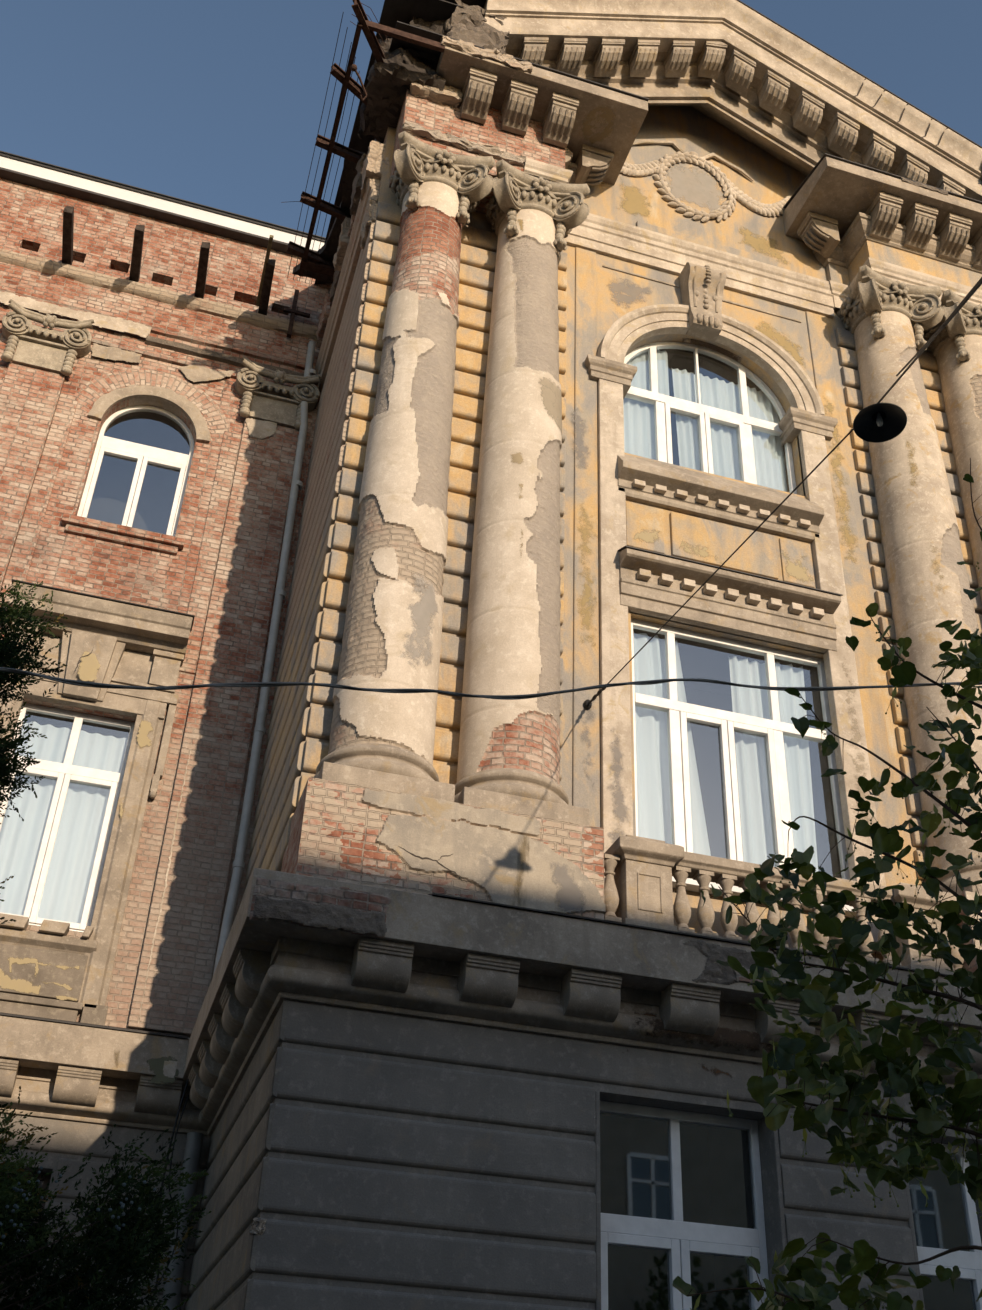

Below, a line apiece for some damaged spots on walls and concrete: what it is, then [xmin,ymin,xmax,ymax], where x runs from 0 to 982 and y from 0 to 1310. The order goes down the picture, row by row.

flaking render [0,291,151,338]
flaking render [91,343,142,363]
flaking render [373,206,463,517]
flaking render [968,374,982,420]
flaking render [328,494,446,762]
flaking render [477,439,562,784]
peeling [579,508,596,638]
flaking render [940,523,981,637]
flaking render [249,777,605,938]
crack [400,847,472,884]
peeling [0,957,80,1001]